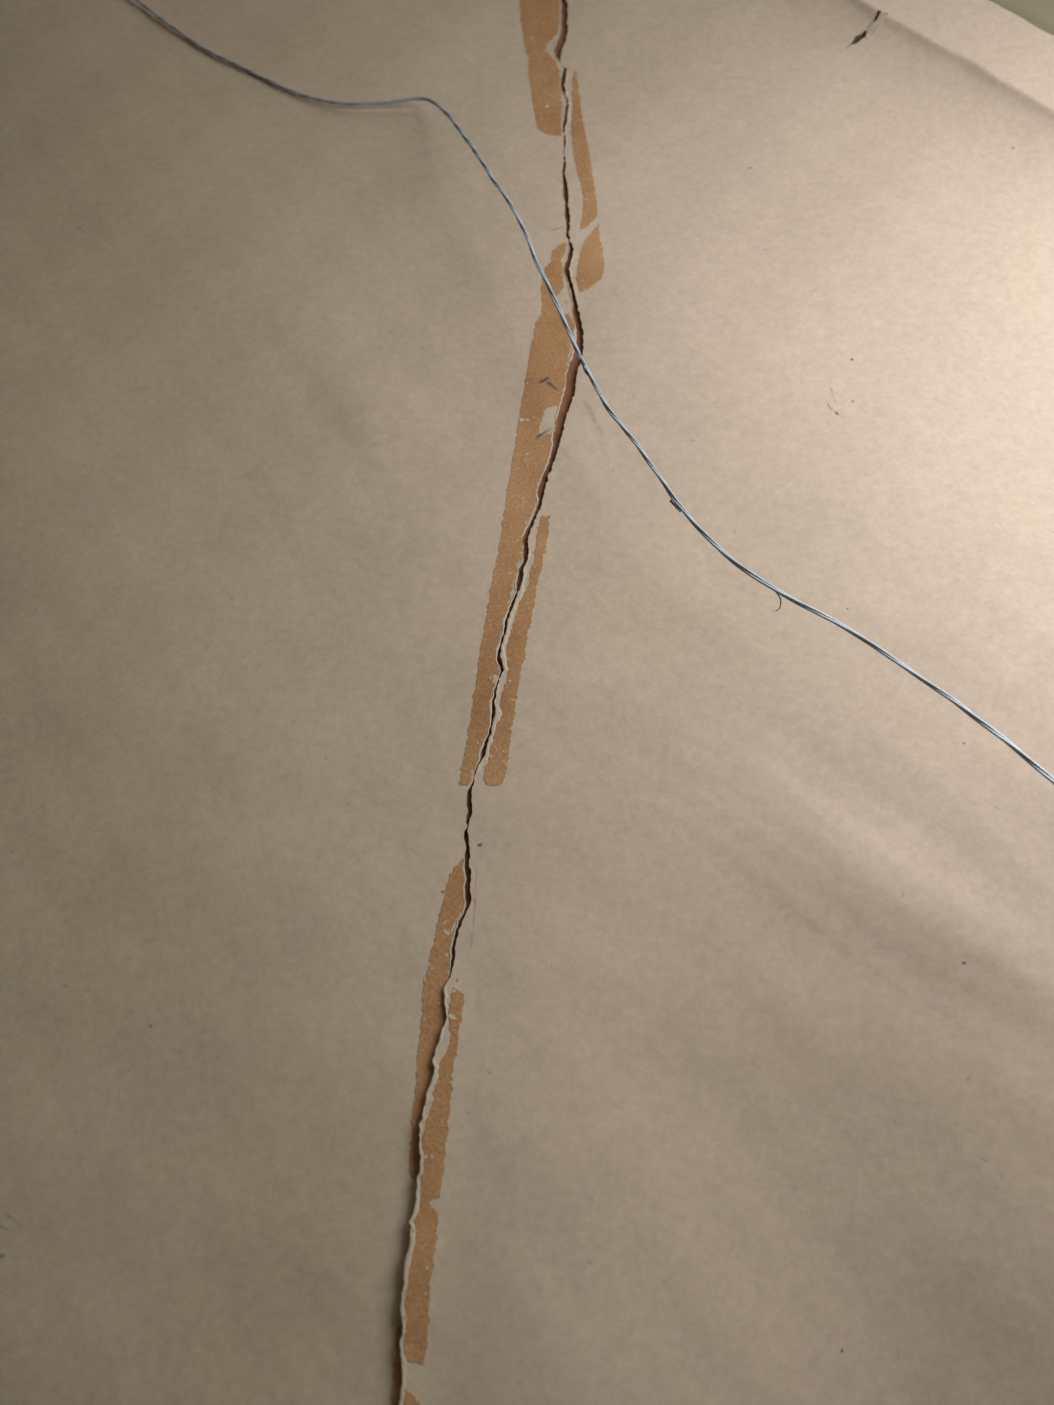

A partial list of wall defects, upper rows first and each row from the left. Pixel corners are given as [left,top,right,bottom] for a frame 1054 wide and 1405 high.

crack [399,0,584,1405]
peeling [459,0,605,786]
peeling [390,858,465,1405]